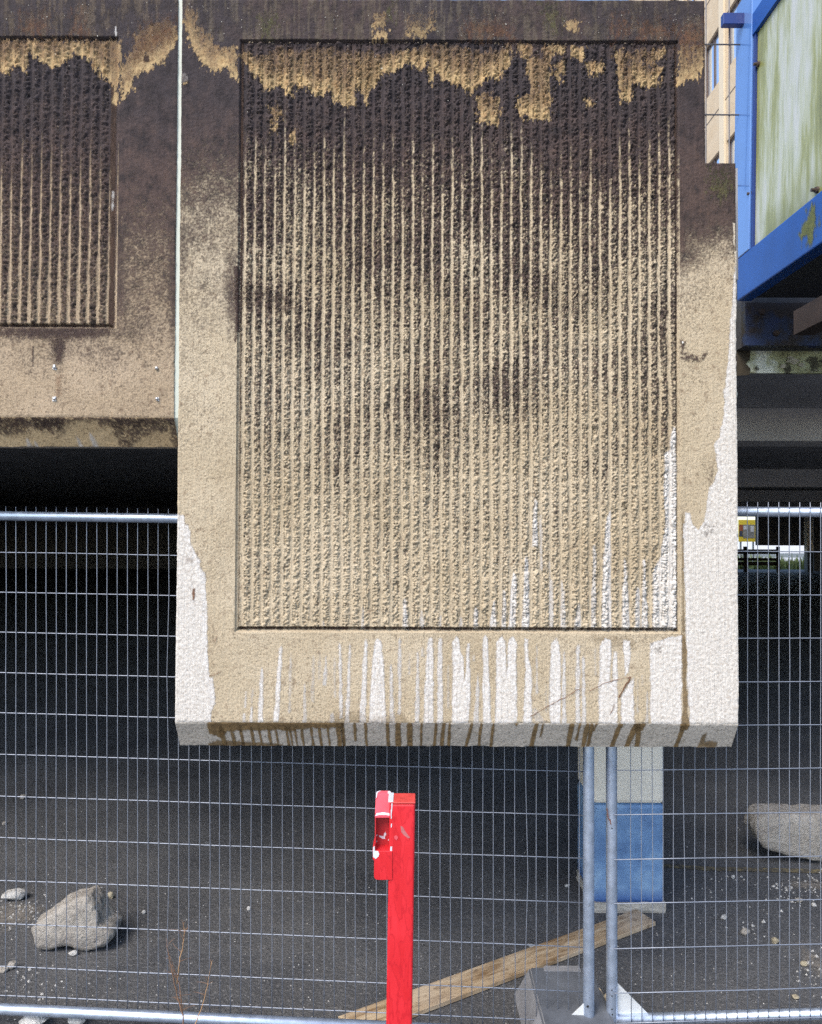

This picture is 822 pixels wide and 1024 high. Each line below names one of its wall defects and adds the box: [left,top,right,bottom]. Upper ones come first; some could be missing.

damp [269,106,296,146]
damp [0,12,705,127]
damp [0,417,178,447]
damp [175,267,751,747]